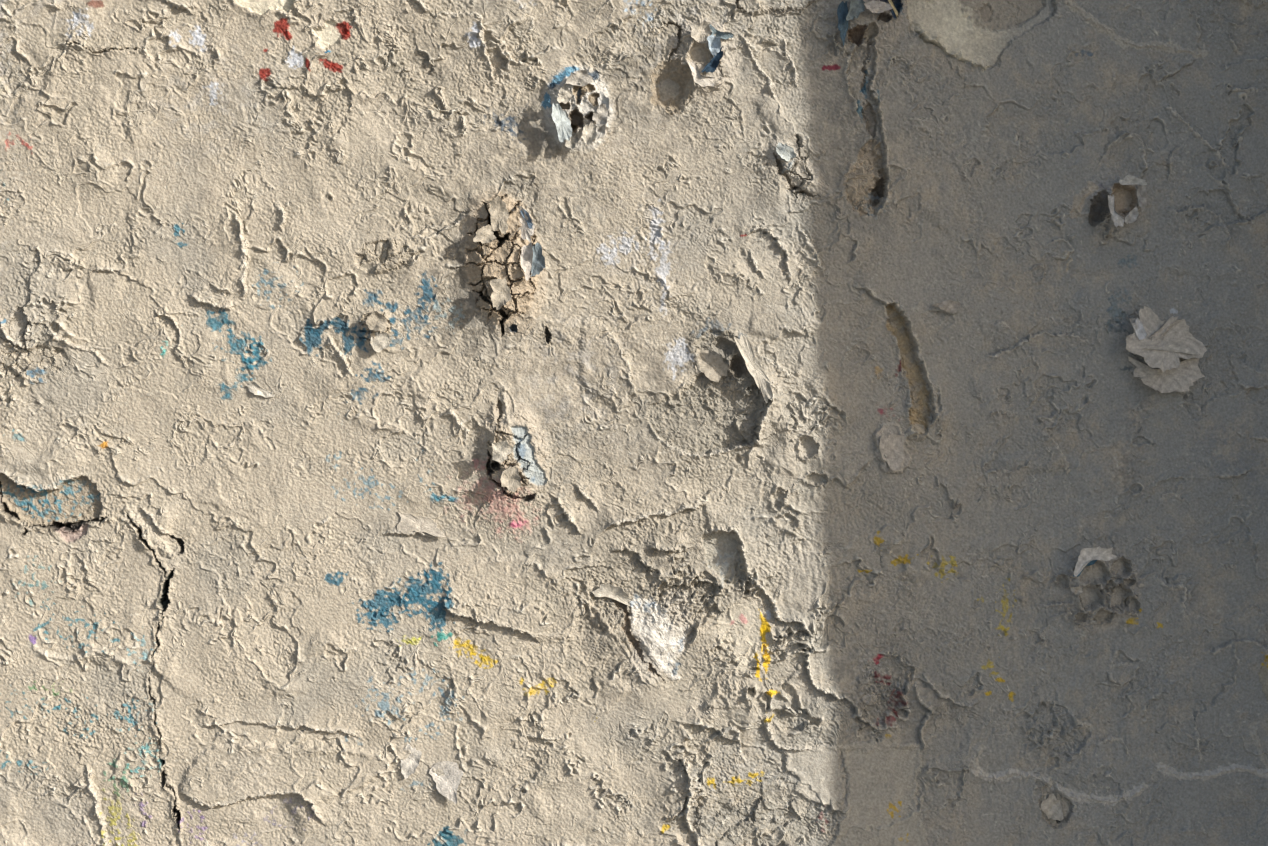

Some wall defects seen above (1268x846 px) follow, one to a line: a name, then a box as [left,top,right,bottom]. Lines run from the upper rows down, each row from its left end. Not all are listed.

crack [71,41,137,54]
spalling [907,0,1083,73]
spalling [833,47,905,225]
spalling [851,267,960,443]
spalling [0,454,103,544]
crack [0,480,185,830]
spalling [555,316,945,846]
peeling [64,766,112,846]